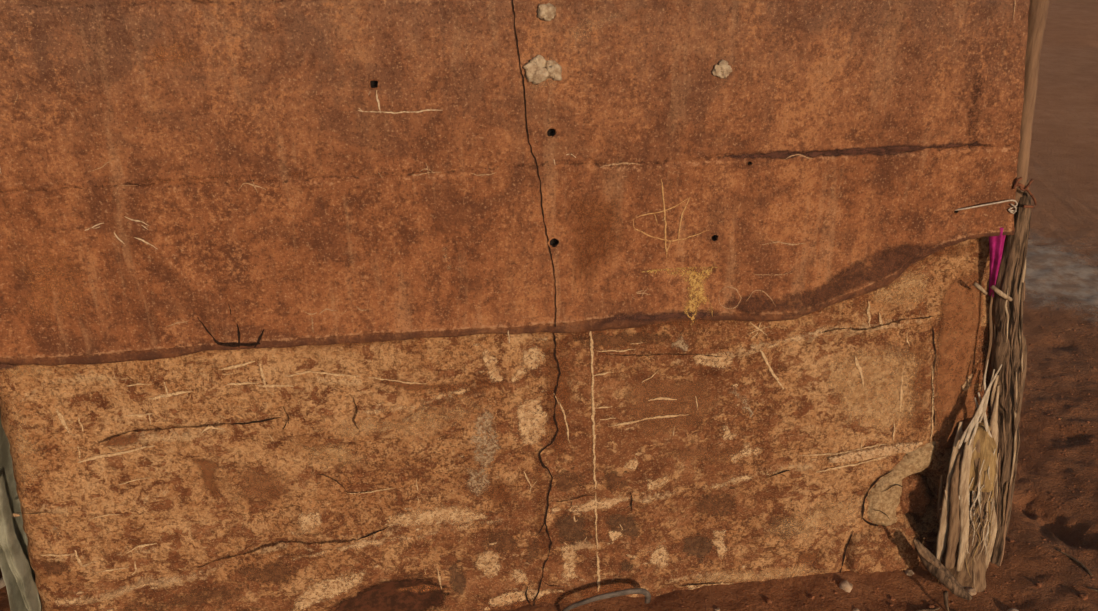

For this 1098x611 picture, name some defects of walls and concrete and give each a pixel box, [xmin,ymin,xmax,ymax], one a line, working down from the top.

corrosion [729,74,986,159]
crack [512,0,594,606]
corrosion [604,243,977,325]
spalling [104,433,138,446]
spalling [192,453,220,497]
peeling [311,380,470,466]
peeling [461,390,547,497]
peeling [340,452,669,610]
peeling [55,592,85,605]
spalling [107,553,297,611]
peeling [293,565,378,611]